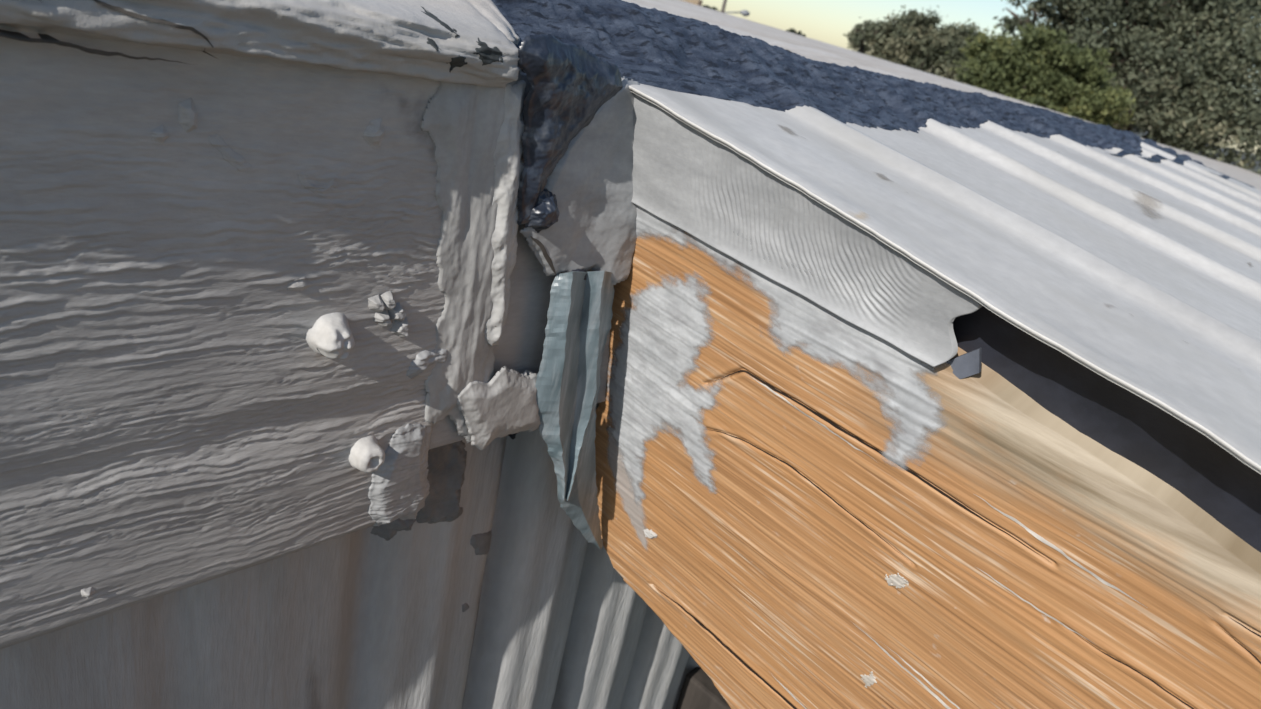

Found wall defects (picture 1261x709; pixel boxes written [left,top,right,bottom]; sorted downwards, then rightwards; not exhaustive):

crack [0,0,216,65]
spalling [421,6,459,38]
spalling [449,38,503,72]
peeling [484,80,526,346]
peeling [457,366,541,450]
crack [706,370,1050,562]
crack [653,586,797,709]